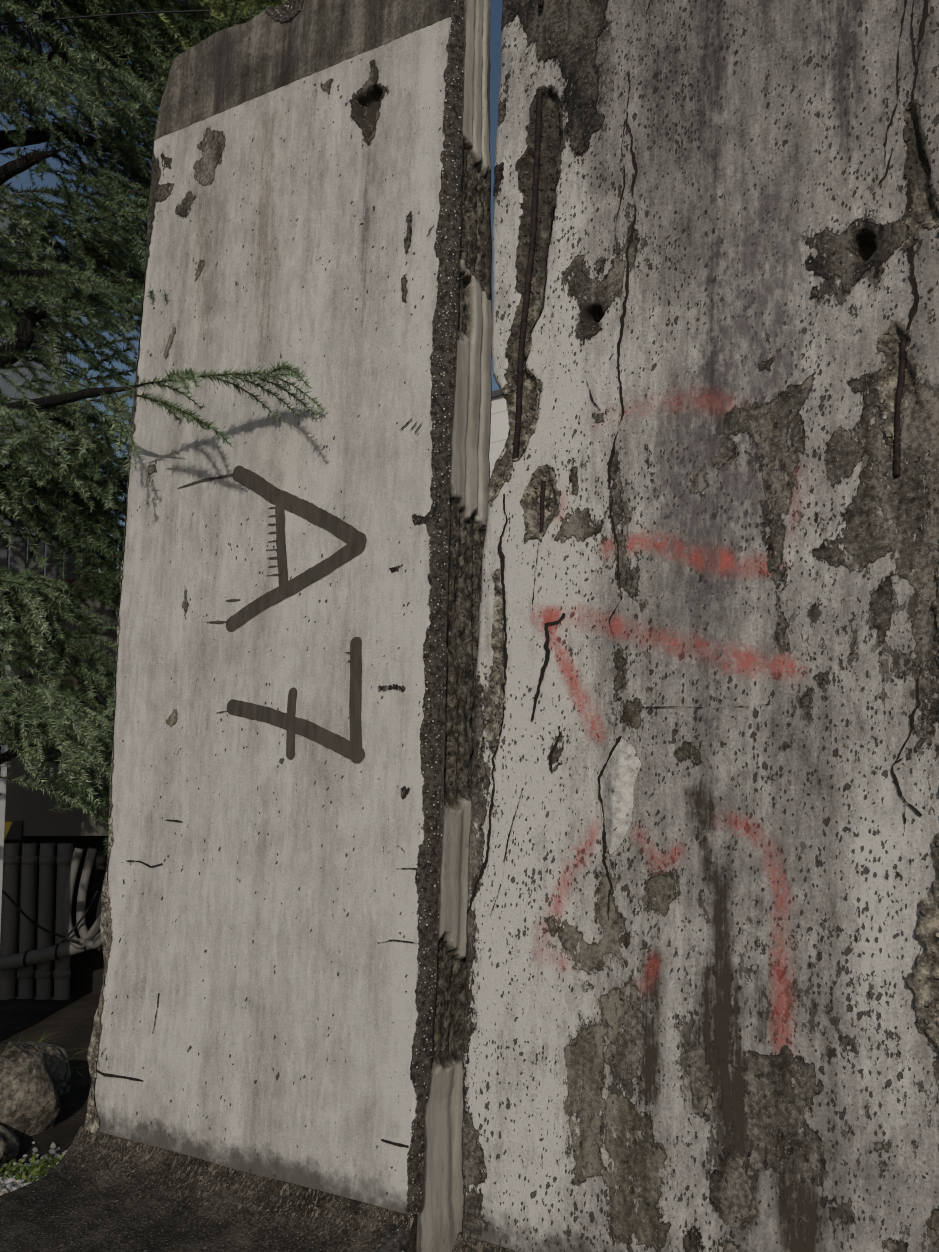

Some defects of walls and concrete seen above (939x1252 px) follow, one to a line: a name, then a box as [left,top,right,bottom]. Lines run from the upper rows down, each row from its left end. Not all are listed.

spalling [84,126,226,1133]
spalling [400,0,466,1218]
crack [467,494,565,914]
spalling [487,0,609,506]
crack [586,74,638,659]
crack [598,736,638,921]
peeling [563,980,706,1252]
water stain [641,953,659,1111]
water stain [686,784,758,1230]
water stain [777,1162,822,1252]
peeling [809,318,939,761]
crack [878,0,929,331]